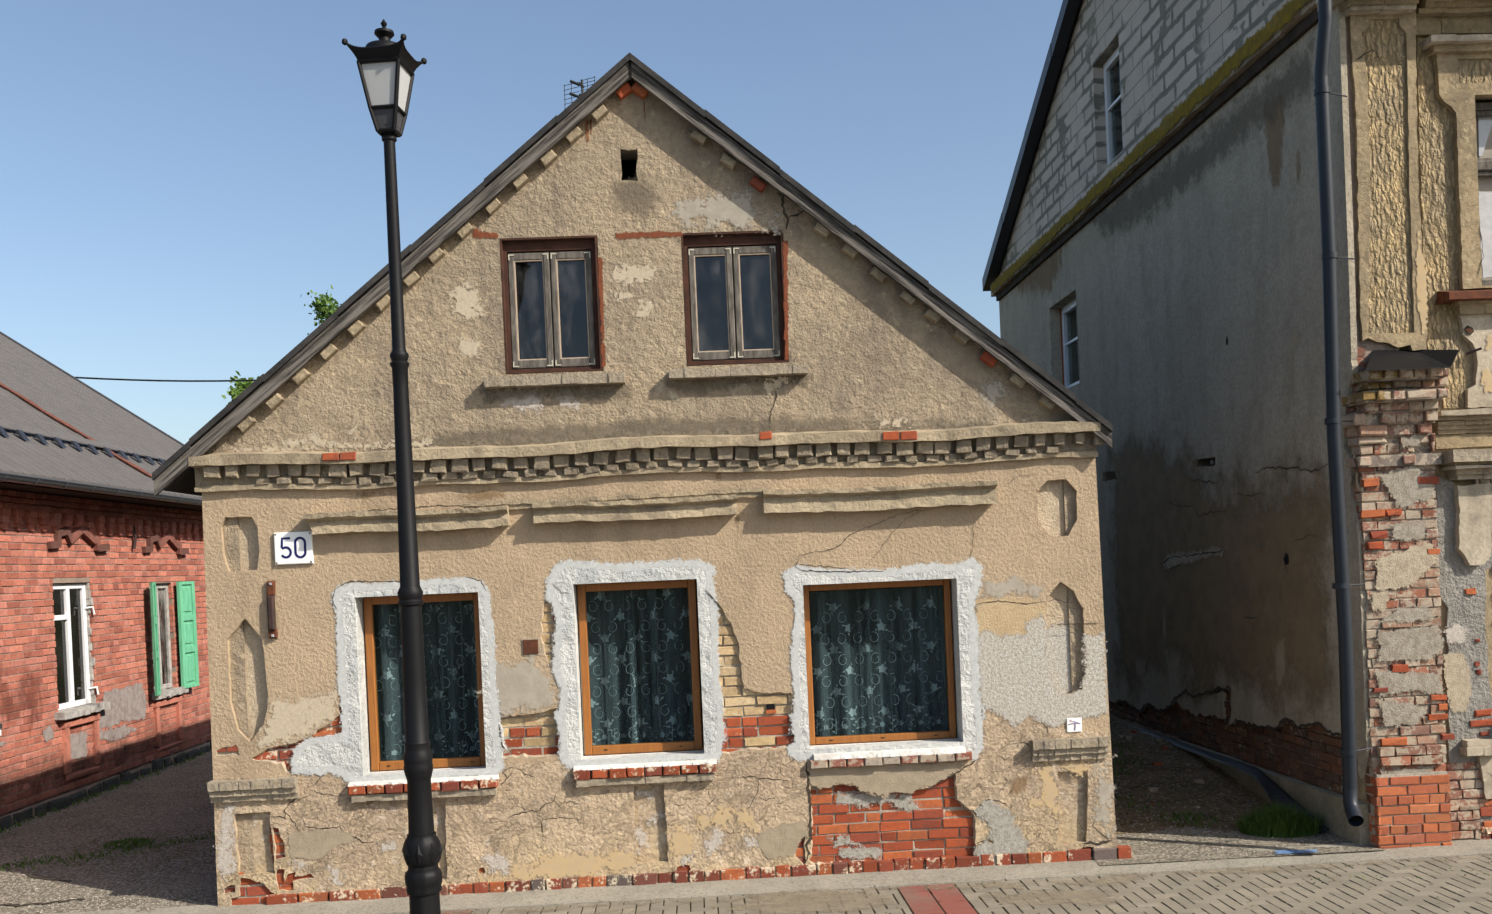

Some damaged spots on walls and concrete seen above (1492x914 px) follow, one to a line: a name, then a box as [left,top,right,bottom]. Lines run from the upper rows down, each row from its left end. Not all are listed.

crack [795,510,924,573]
damp [1107,438,1332,707]
flaking render [1360,509,1402,550]
flaking render [540,599,556,669]
peeling [975,596,1046,637]
flaking render [717,602,796,754]
flaking render [216,701,343,775]
flaking render [499,708,561,759]
flaking render [1426,695,1455,740]
flaking render [1470,709,1492,736]
flaking render [796,774,976,865]
flaking render [224,826,314,905]